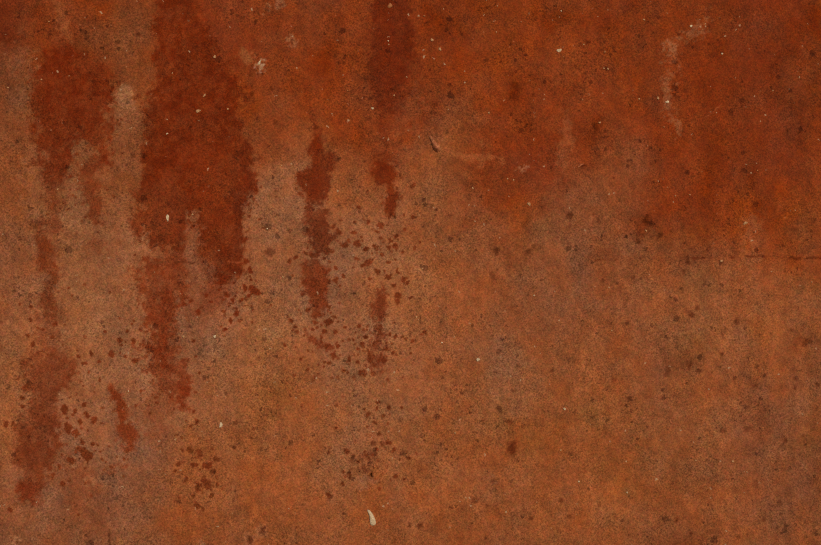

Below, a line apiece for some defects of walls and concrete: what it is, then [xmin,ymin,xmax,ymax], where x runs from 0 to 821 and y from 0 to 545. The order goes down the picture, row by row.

rust [2,0,268,528]
rust [282,0,428,379]